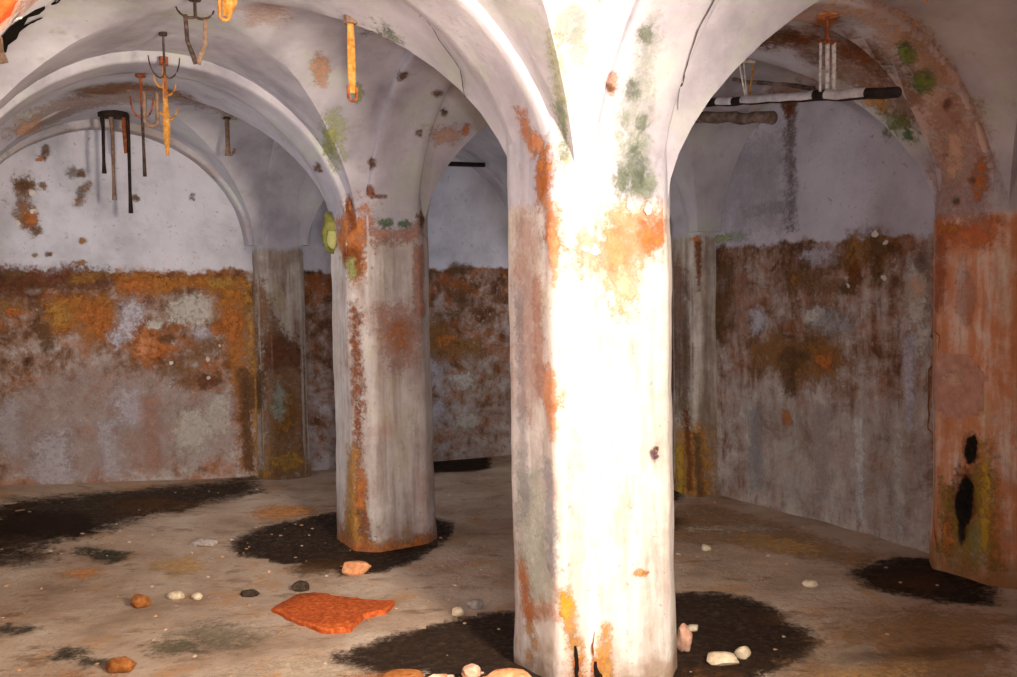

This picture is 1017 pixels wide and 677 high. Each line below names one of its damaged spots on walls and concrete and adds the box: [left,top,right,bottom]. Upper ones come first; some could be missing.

flaking render [0,0,38,31]
crack [2,0,61,53]
crack [427,21,466,97]
water stain [551,45,569,160]
rust [515,107,568,286]
water stain [616,147,656,197]
rust [693,235,702,292]
rust [338,305,434,552]
water stain [0,476,266,566]
spalling [952,434,978,545]
rust [936,440,1001,572]
crack [574,631,603,677]